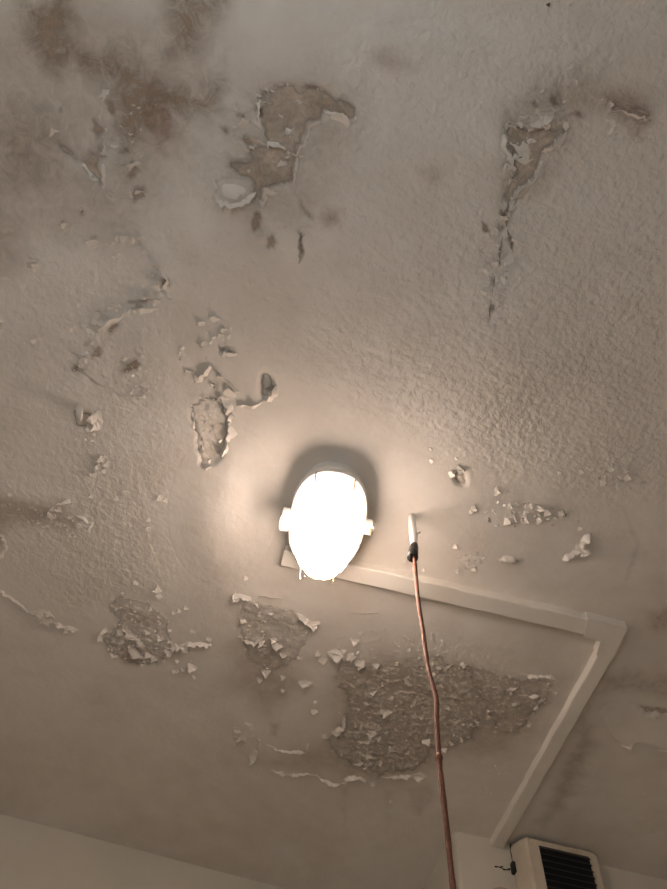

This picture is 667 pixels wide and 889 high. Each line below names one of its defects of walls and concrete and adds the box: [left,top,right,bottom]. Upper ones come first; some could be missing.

peeling [223,82,360,246]
peeling [478,65,578,324]
peeling [73,263,172,374]
peeling [71,404,103,442]
peeling [178,315,278,470]
spalling [468,486,567,528]
peeling [563,521,592,562]
spalling [97,584,212,680]
peeling [229,593,321,693]
spalling [271,629,558,787]